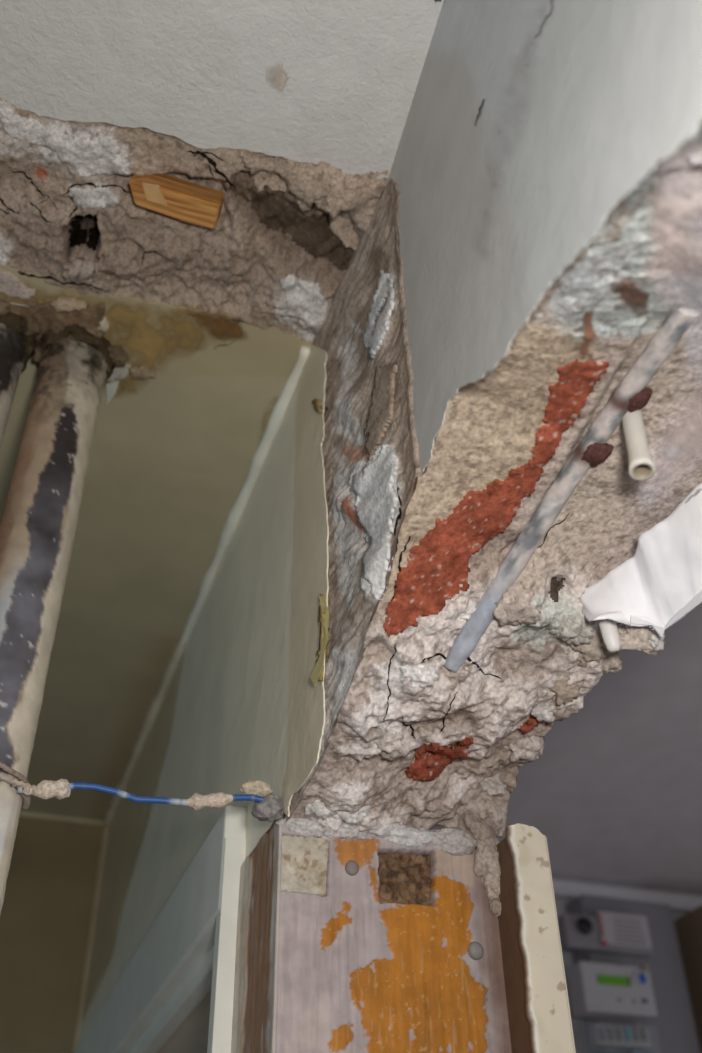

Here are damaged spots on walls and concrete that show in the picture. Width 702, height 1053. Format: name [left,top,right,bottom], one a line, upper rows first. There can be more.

crack [0,171,130,224]
crack [188,150,236,189]
leakage [0,293,243,392]
spalling [0,97,702,917]
crack [391,487,411,601]
crack [382,631,416,752]
crack [440,692,458,732]
crack [422,653,501,679]